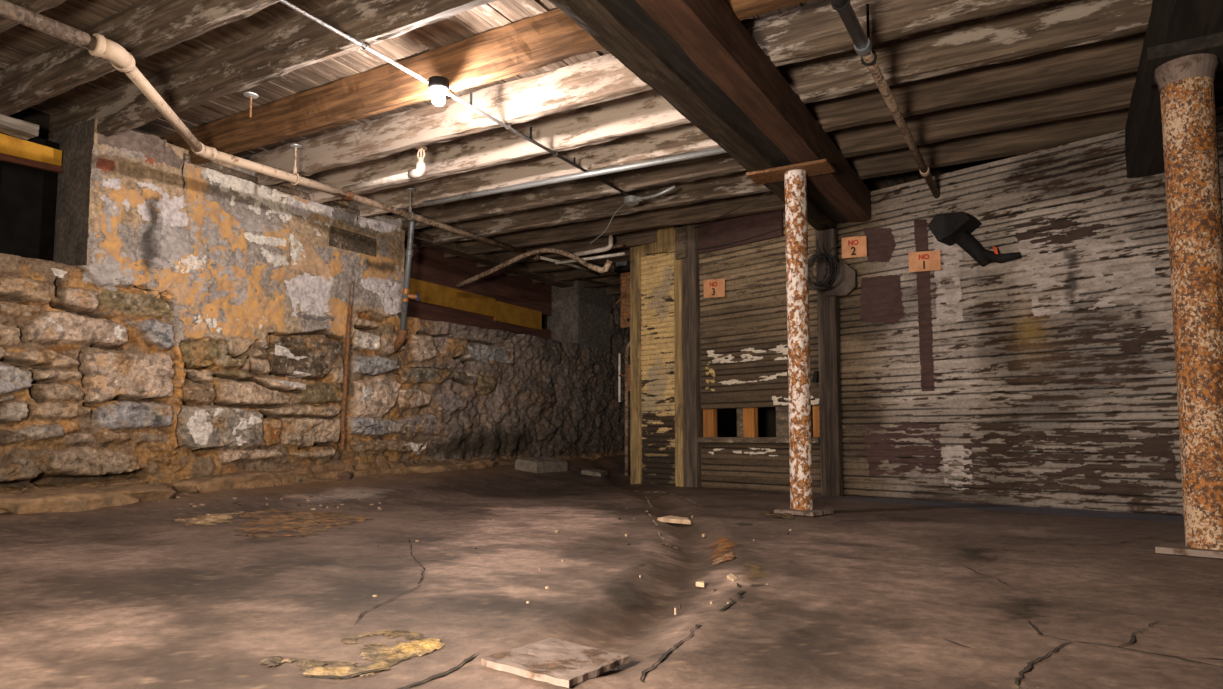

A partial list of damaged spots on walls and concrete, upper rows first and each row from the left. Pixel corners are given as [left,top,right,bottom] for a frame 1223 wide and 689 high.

peeling [82,130,402,341]
peeling [859,219,965,391]
peeling [1014,218,1173,353]
peeling [705,344,788,391]
peeling [708,448,778,456]
peeling [860,422,1178,495]
crack [354,539,425,625]
crack [640,583,745,682]
crack [1014,616,1223,689]